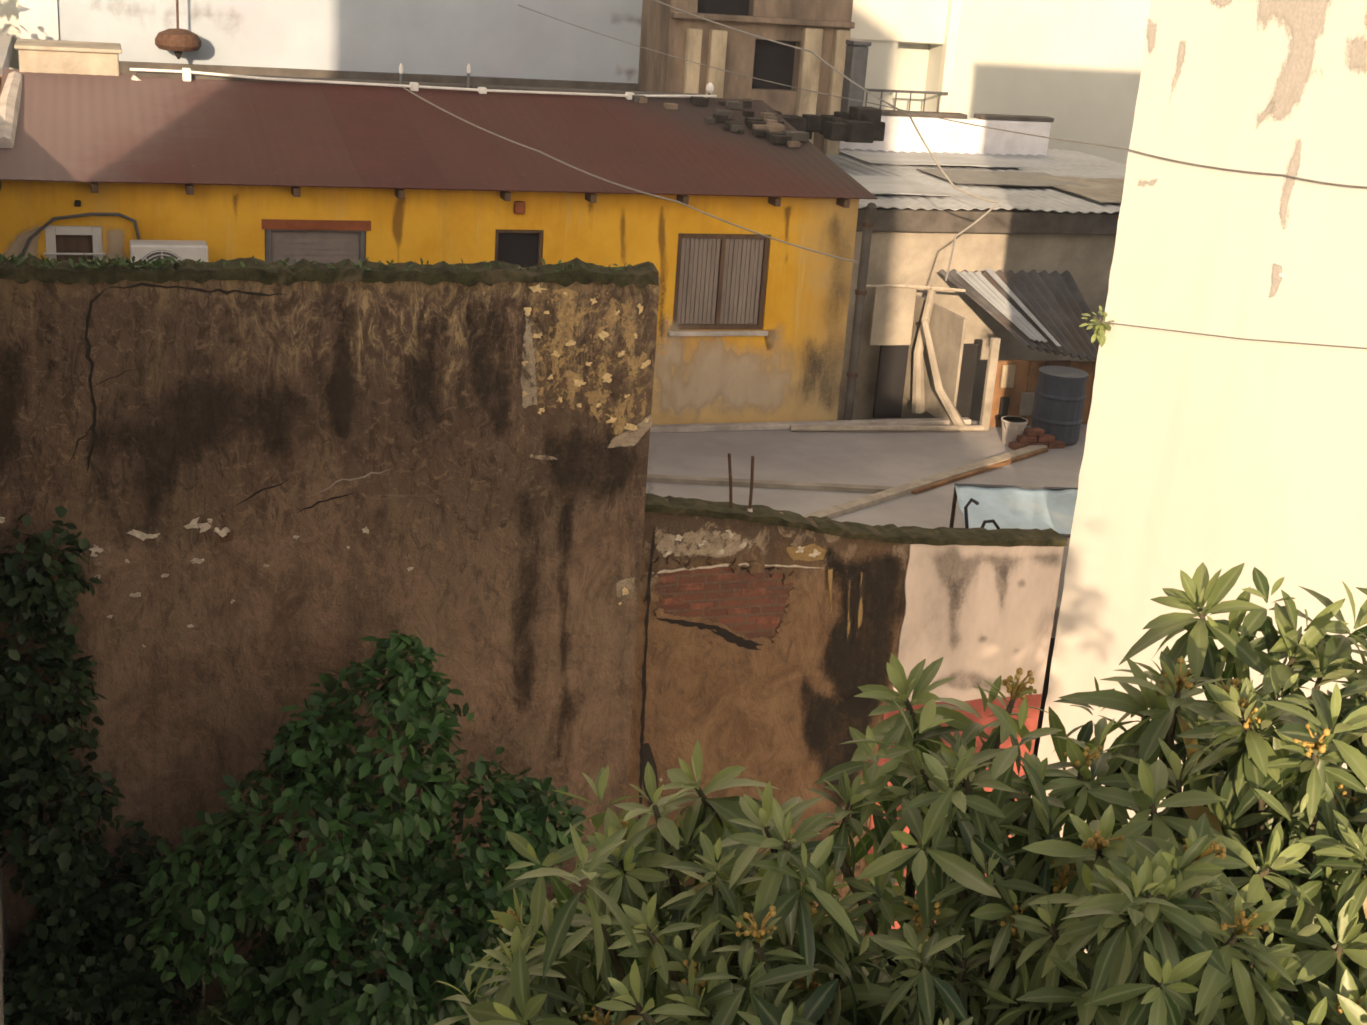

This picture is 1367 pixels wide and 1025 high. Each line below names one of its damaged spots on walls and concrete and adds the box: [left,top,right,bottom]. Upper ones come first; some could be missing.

spalling [1270,264,1284,297]
crack [68,283,285,472]
leakage [89,379,298,517]
leakage [328,310,353,438]
leakage [468,310,508,433]
peeling [520,283,790,448]
leakage [513,560,538,706]
leakage [546,429,636,662]
spalling [615,530,827,650]
leakage [802,550,906,806]